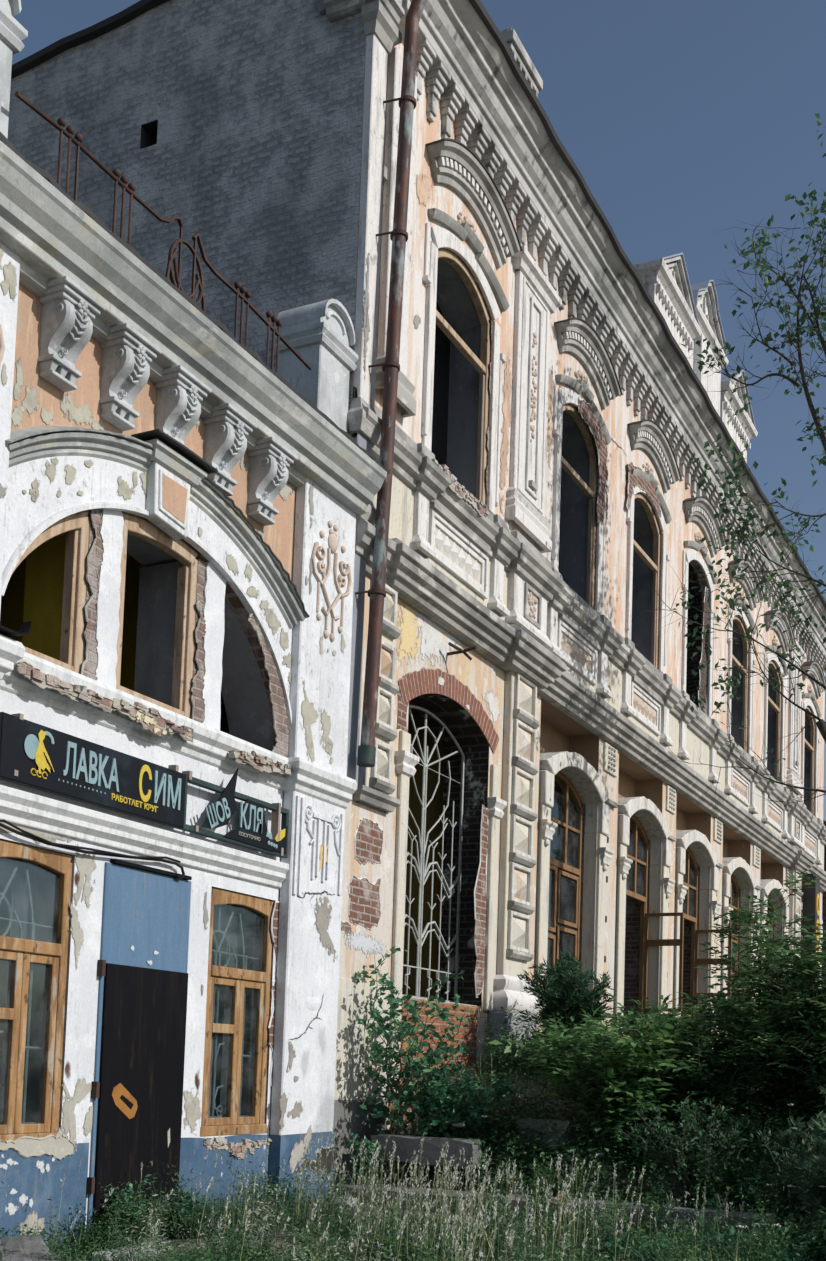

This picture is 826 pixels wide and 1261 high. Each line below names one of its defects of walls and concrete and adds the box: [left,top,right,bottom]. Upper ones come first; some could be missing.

peeling [2,351,117,430]
peeling [0,457,93,502]
peeling [117,471,147,501]
flaking render [17,509,206,742]
flaking render [226,552,333,776]
flaking render [314,818,389,962]
flaking render [182,901,334,1177]
crack [289,994,324,1040]
flaking render [0,1073,95,1174]